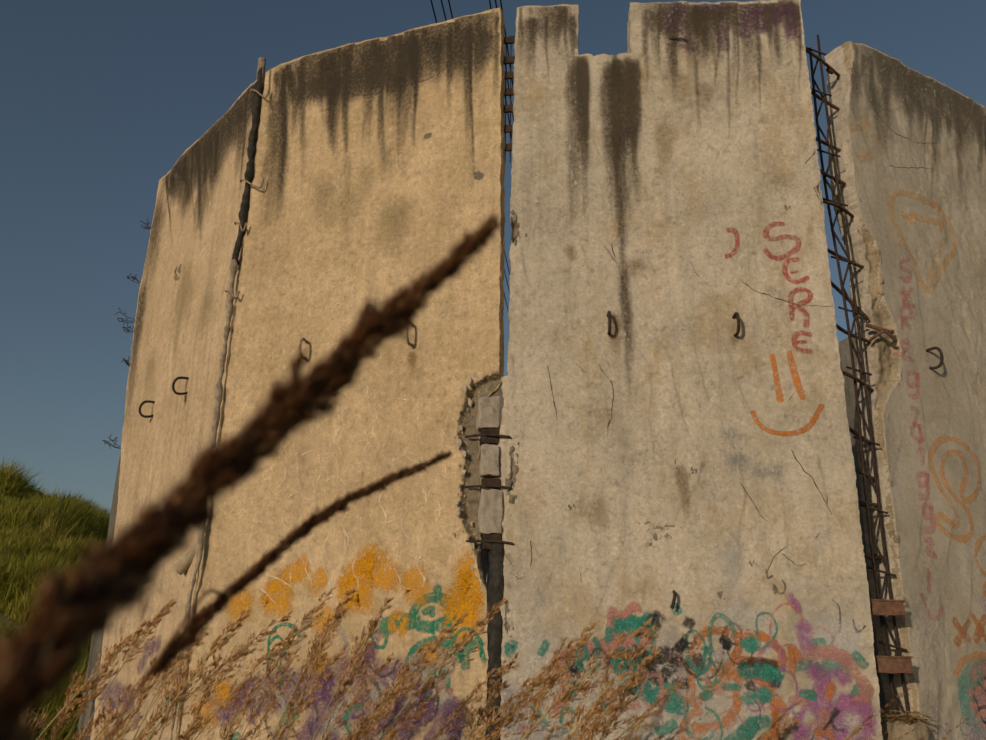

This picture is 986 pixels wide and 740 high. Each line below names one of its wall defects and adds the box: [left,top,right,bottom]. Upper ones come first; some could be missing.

leakage [150,83,255,250]
leakage [269,13,499,183]
leakage [518,6,588,168]
leakage [603,59,639,180]
leakage [643,0,801,79]
leakage [851,46,986,154]
leakage [129,289,145,381]
leakage [620,273,631,346]
spalling [452,368,501,570]
spalling [505,441,519,504]
spalling [861,224,924,718]